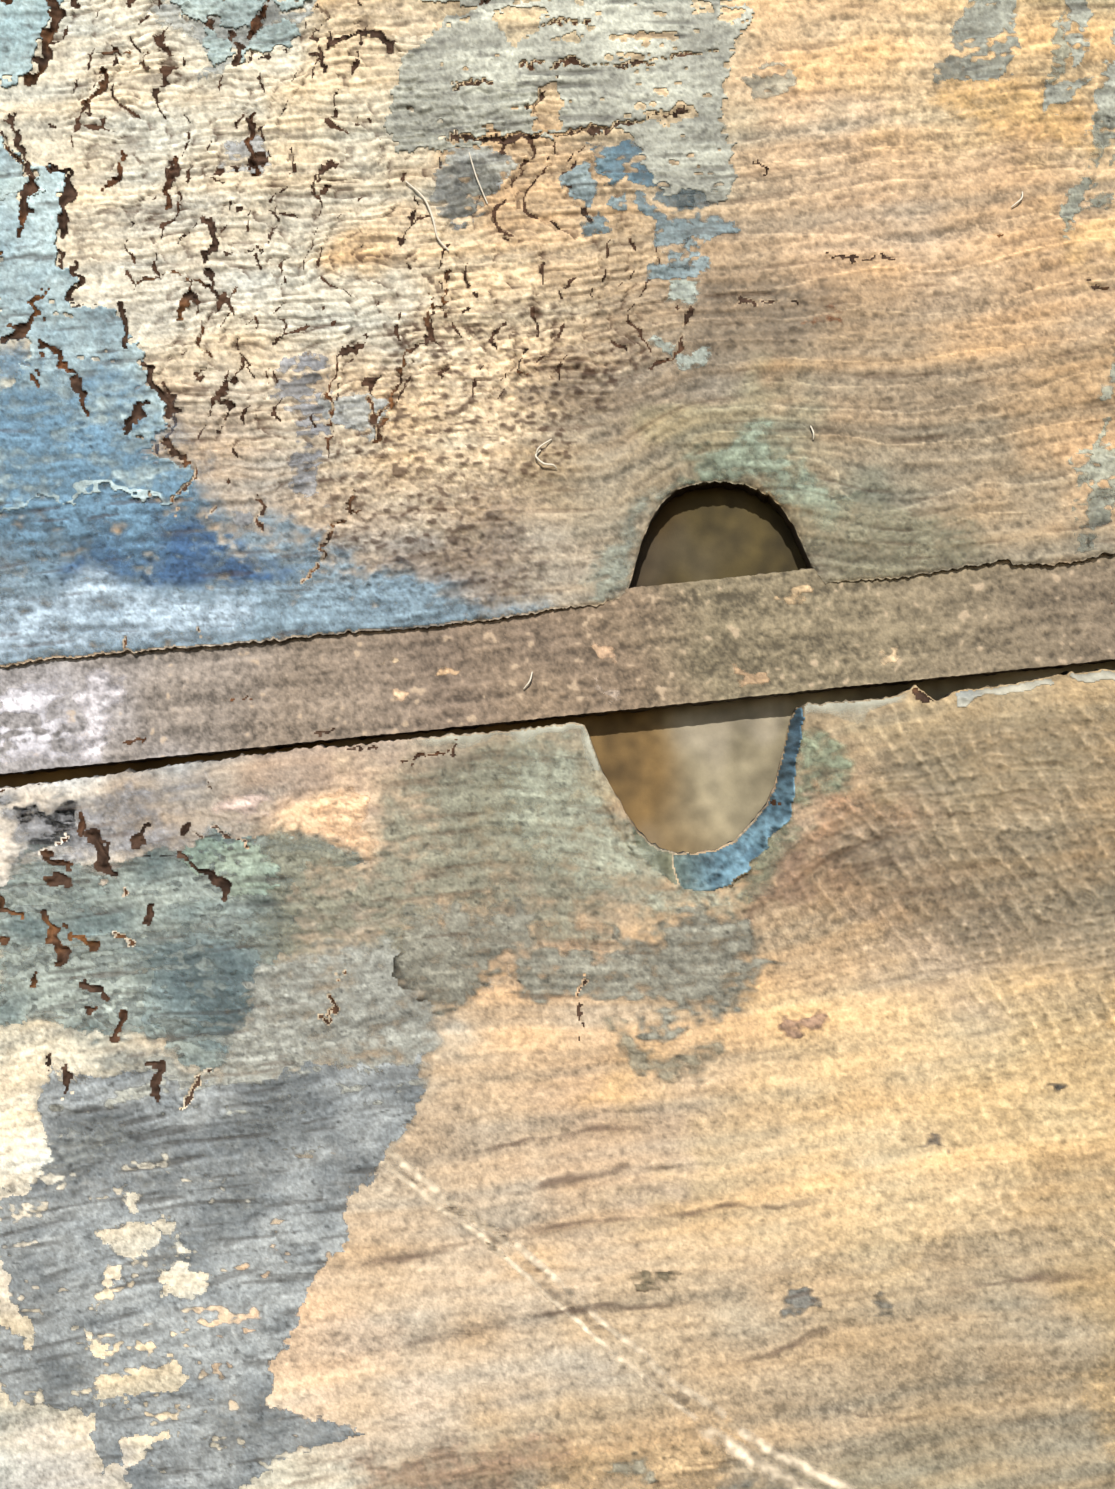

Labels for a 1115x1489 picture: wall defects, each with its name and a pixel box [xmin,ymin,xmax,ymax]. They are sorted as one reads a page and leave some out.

peeling [0,0,64,88]
peeling [147,0,317,82]
peeling [933,0,1022,84]
peeling [383,0,797,304]
crack [0,0,717,531]
crack [738,295,799,306]
crack [826,252,895,264]
peeling [0,135,320,662]
crack [302,489,362,582]
peeling [0,671,125,763]
crack [0,812,248,1110]
peeling [0,803,426,1489]